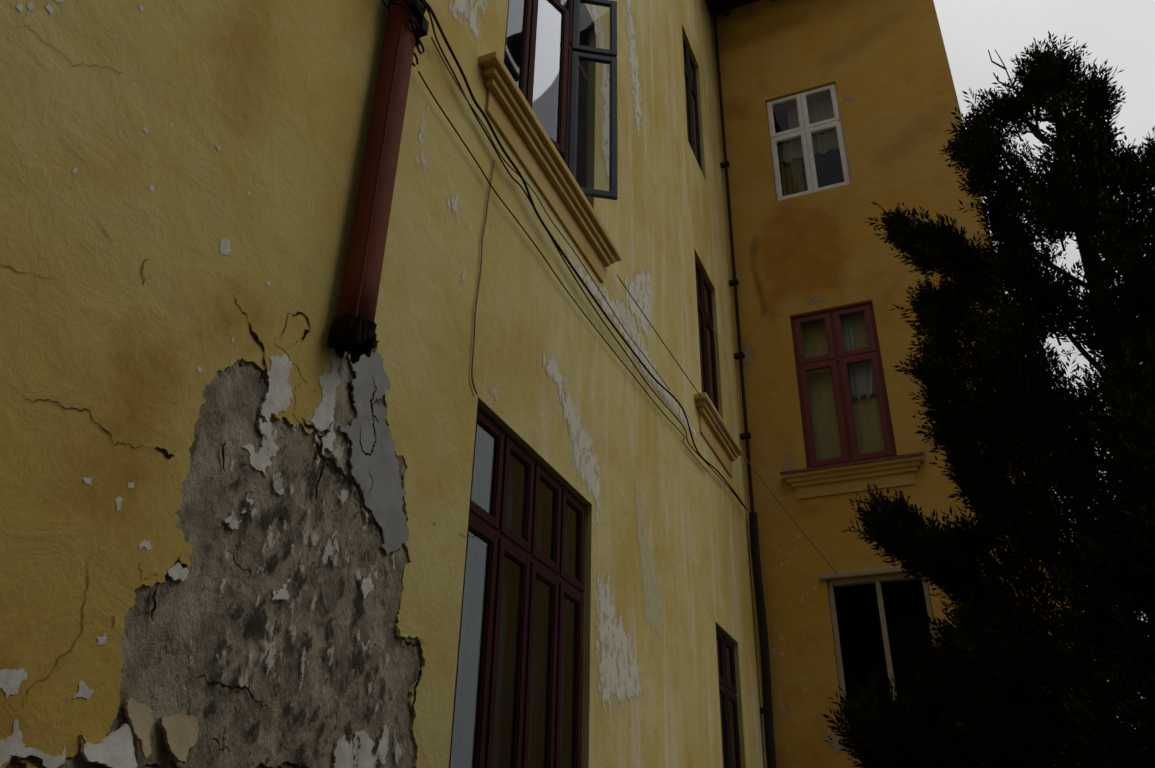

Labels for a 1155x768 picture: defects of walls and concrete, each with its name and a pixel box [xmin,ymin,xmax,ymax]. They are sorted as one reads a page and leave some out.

peeling [449,0,488,40]
crack [235,297,312,388]
crack [21,392,175,459]
crack [220,441,228,473]
crack [302,381,379,532]
peeling [543,352,605,533]
crack [23,553,95,702]
crack [150,584,158,622]
flaking render [0,351,422,768]
peeling [595,569,644,715]